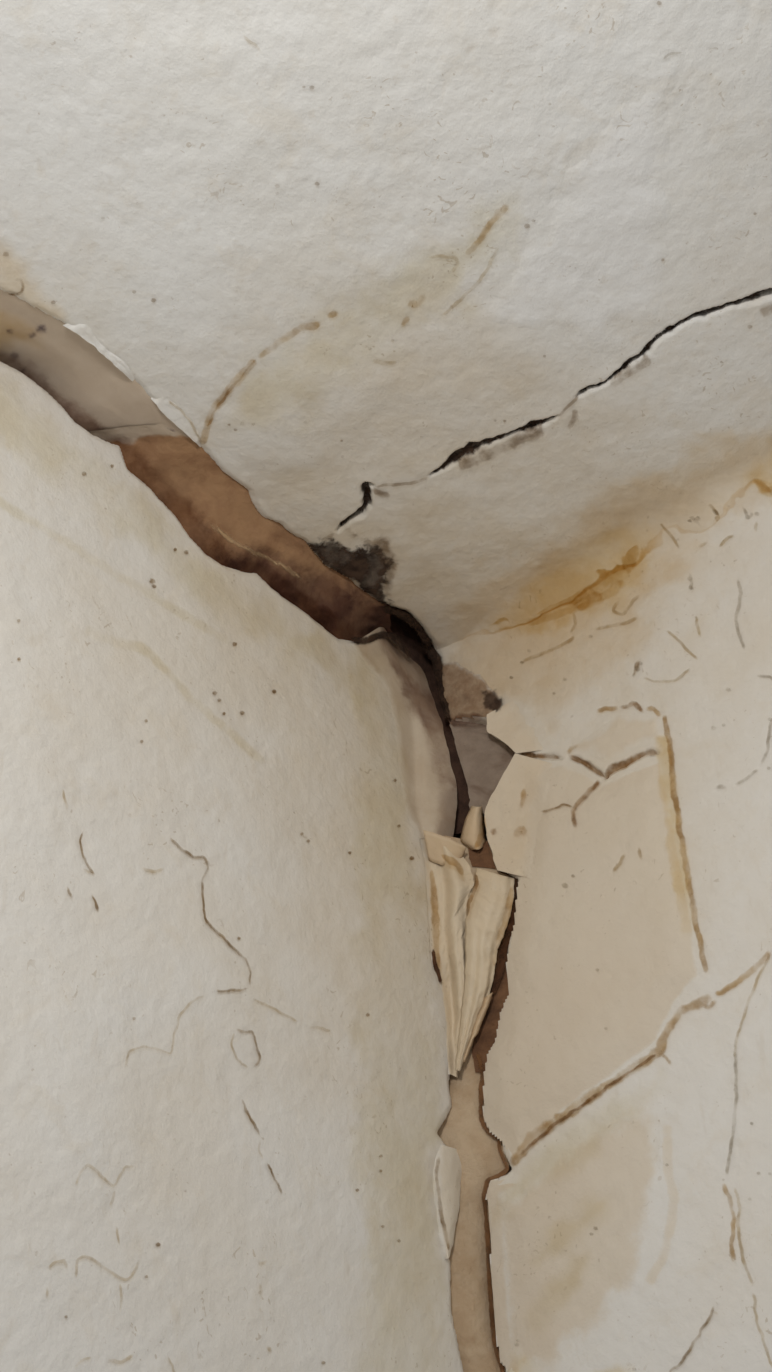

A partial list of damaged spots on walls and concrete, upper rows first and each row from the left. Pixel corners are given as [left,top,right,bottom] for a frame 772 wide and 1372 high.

crack [580,288,772,393]
spalling [0,289,392,641]
crack [339,482,371,526]
crack [432,416,554,472]
leakage [307,539,393,606]
crack [522,753,640,823]
crack [490,871,518,995]
peeling [420,662,552,1372]
crack [476,1053,509,1372]